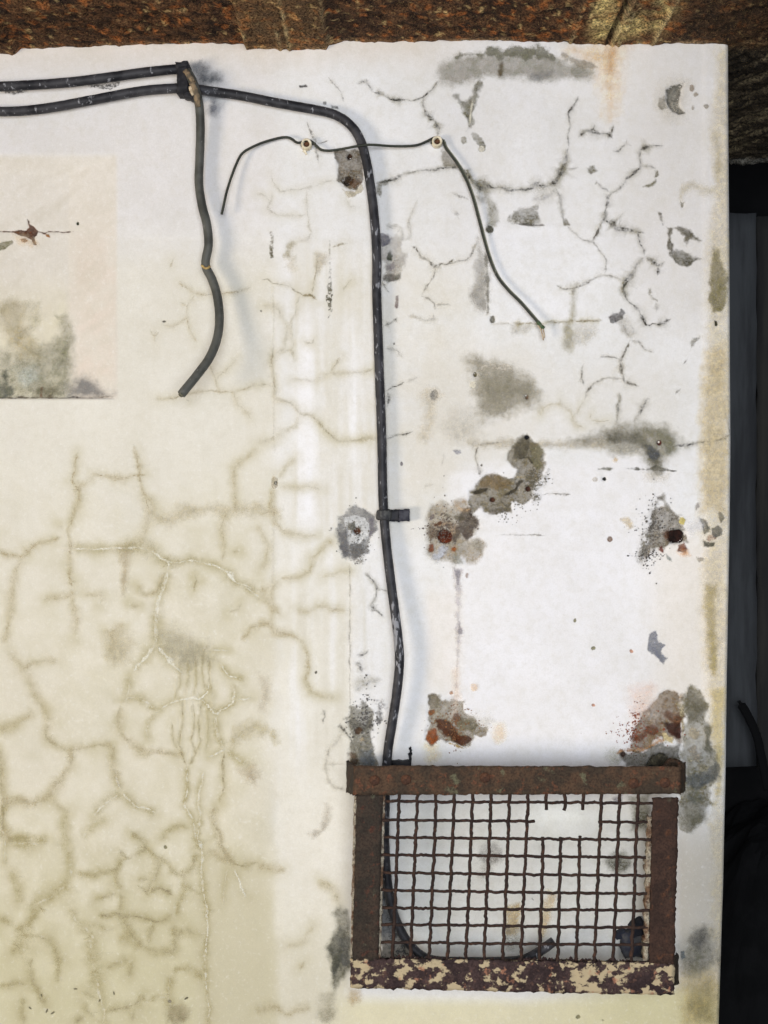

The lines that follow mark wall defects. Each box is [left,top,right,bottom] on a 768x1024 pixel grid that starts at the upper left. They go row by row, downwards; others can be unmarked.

crack [363,81,440,129]
crack [430,99,668,412]
damp [470,357,535,416]
damp [703,240,729,528]
damp [538,425,674,467]
spalling [418,435,553,568]
spalling [627,494,724,584]
spalling [345,674,387,766]
spalling [421,691,492,764]
spalling [606,690,686,766]
damp [679,541,727,829]
crack [2,753,73,844]